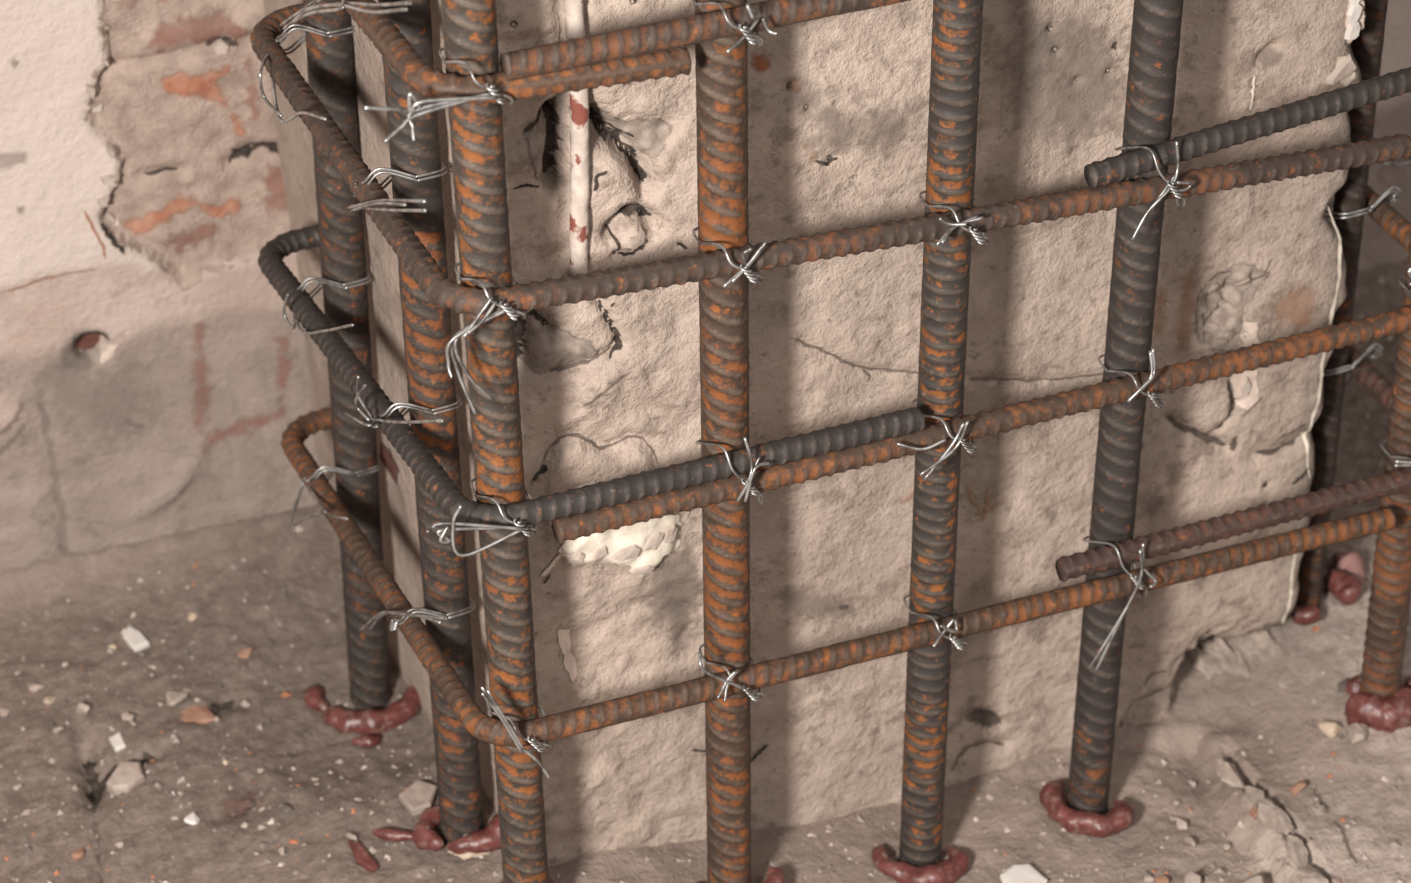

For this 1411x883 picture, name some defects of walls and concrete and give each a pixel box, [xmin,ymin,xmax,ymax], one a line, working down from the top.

flaking render [81,0,291,291]
spalling [382,55,562,289]
spalling [676,34,749,253]
spalling [925,0,984,216]
spalling [1112,0,1184,153]
spalling [398,258,609,505]
crack [595,298,622,359]
spalling [699,274,749,457]
spalling [1102,201,1165,382]
peeling [559,513,681,577]
spalling [908,443,962,625]
spalling [1067,596,1128,814]